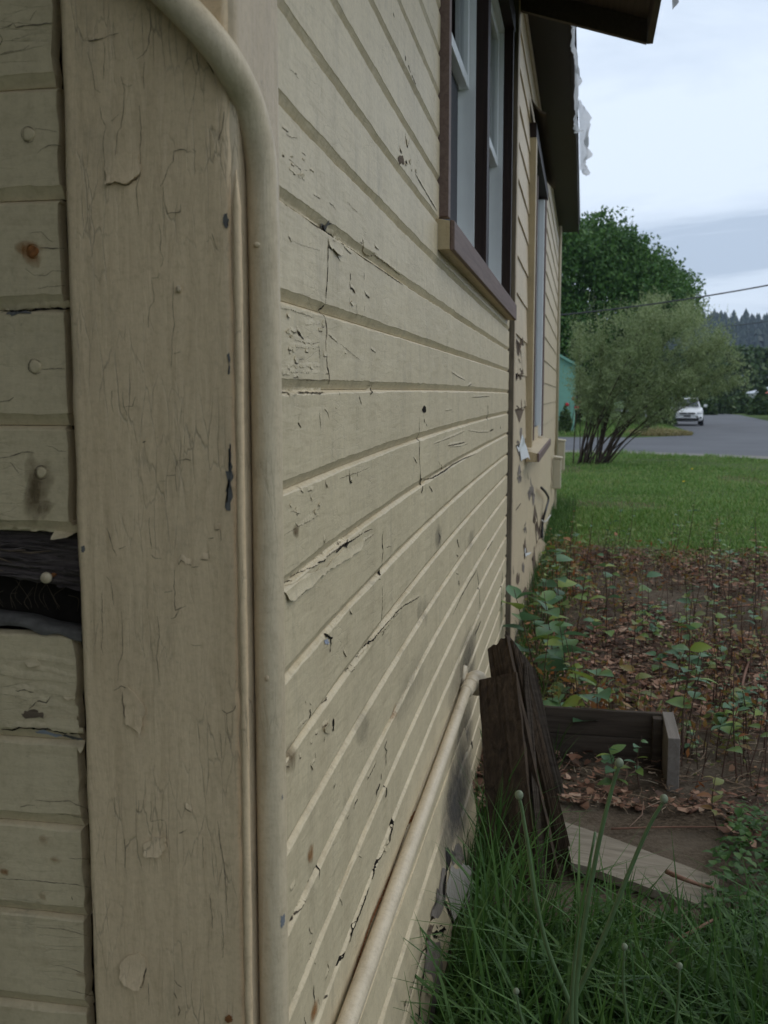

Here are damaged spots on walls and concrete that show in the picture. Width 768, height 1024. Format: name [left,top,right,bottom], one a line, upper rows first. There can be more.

peeling [398,133,437,211]
peeling [316,219,401,275]
peeling [281,302,328,398]
spalling [0,524,86,642]
peeling [284,527,374,601]
crack [327,529,383,559]
crack [289,861,368,1024]